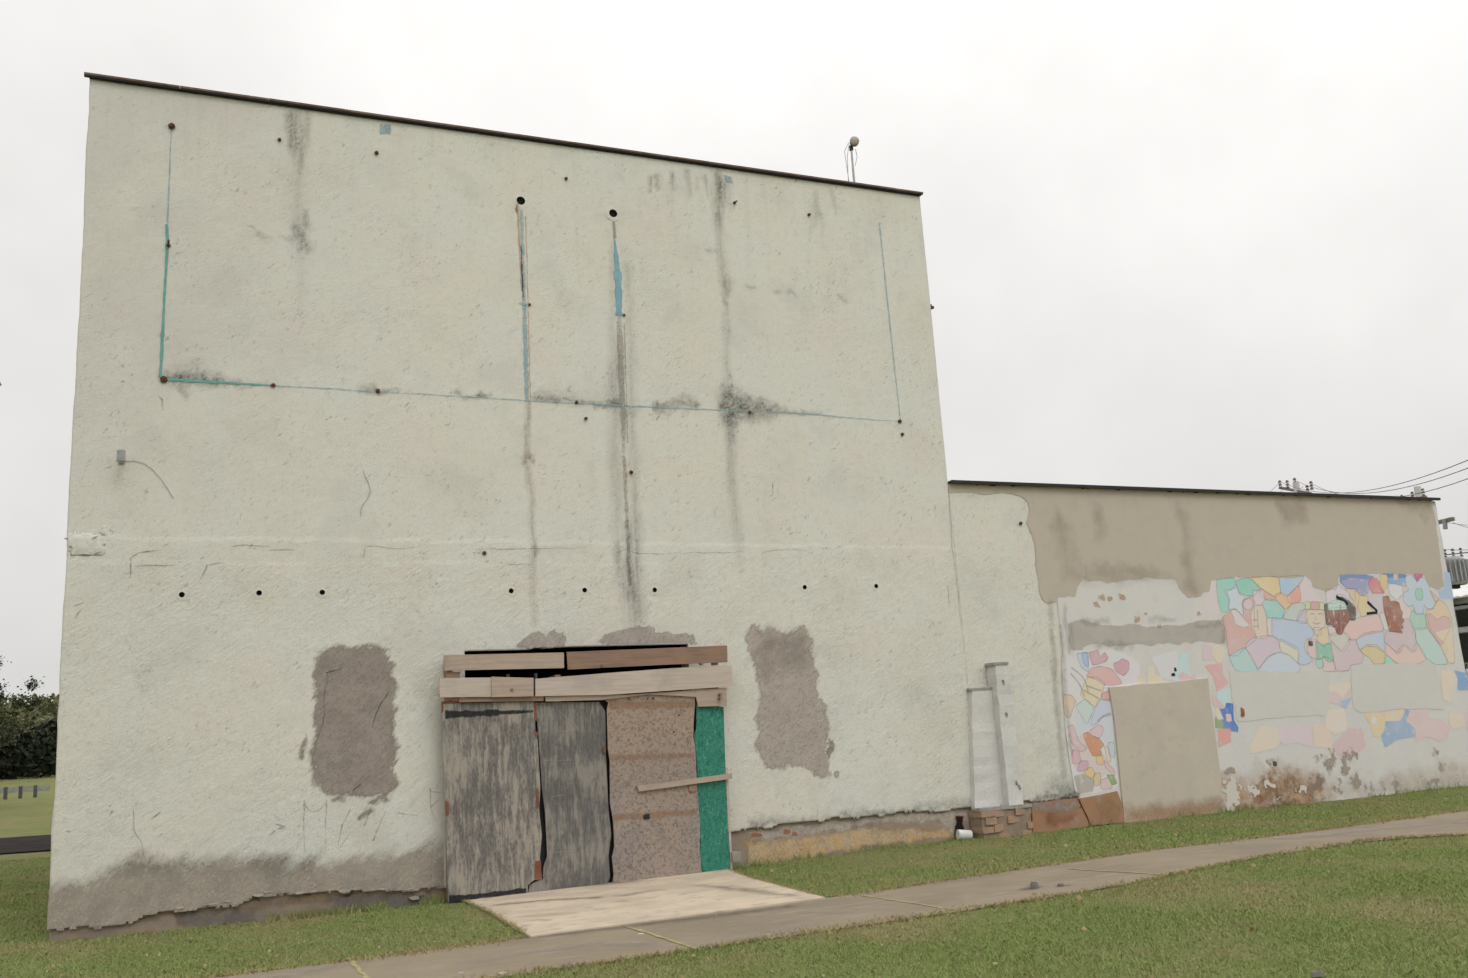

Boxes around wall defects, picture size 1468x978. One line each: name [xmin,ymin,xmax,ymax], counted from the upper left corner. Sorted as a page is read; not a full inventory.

spalling [1221,751,1361,811]